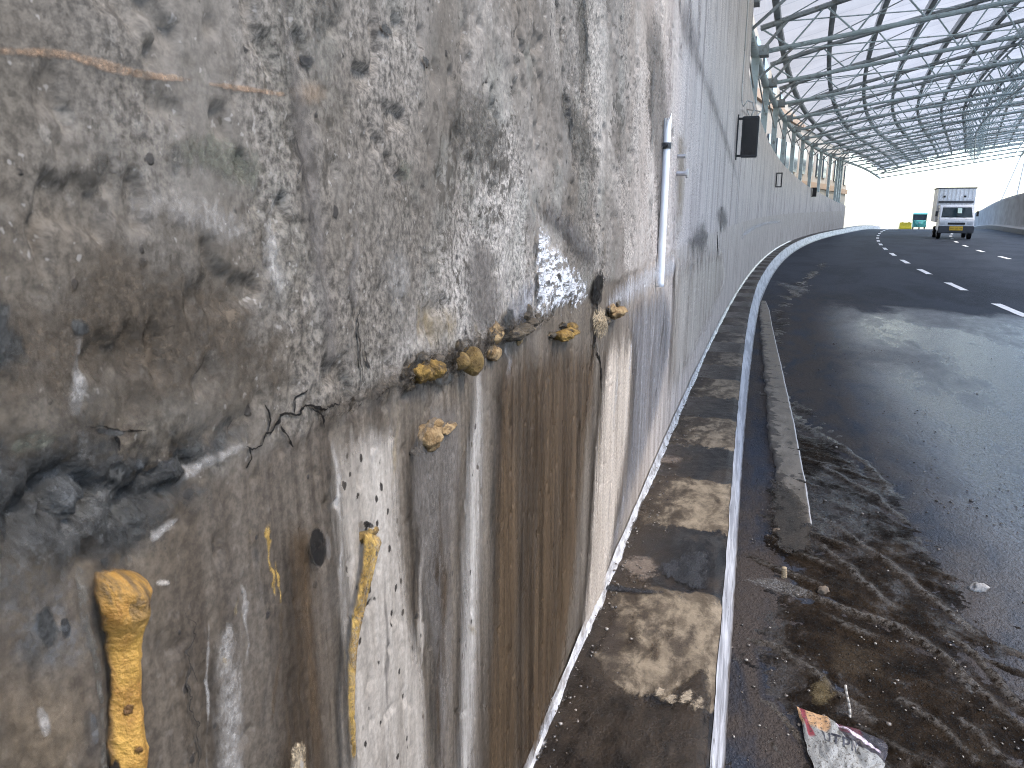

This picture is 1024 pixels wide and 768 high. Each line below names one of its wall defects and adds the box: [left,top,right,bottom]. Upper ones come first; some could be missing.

corrosion [4,49,178,80]
damp [511,204,596,325]
crack [242,305,371,468]
crack [588,303,603,393]
spalling [0,421,244,589]
corrosion [264,527,281,601]
corrosion [348,521,382,758]
damp [461,411,480,768]
damp [490,228,725,768]